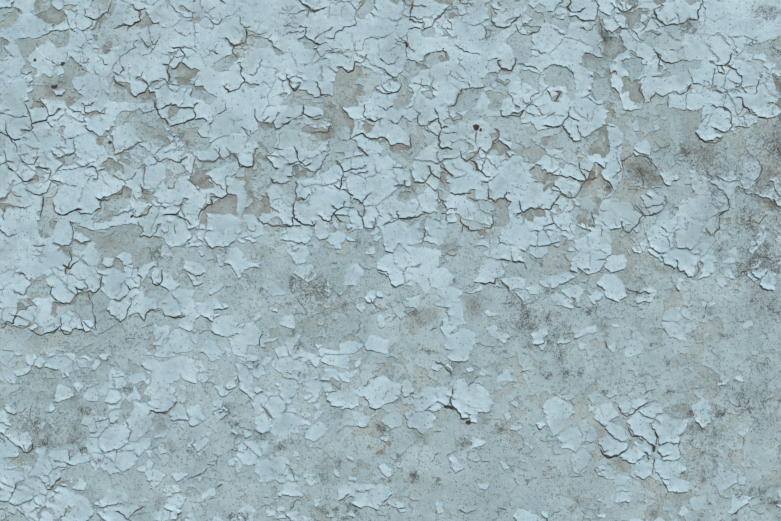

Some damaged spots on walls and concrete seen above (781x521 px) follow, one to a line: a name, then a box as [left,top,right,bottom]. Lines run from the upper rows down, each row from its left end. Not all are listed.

crack [0,0,781,336]
peeling [0,271,414,521]
peeling [405,378,493,434]
peeling [470,436,486,451]
peeling [513,508,550,521]
peeling [536,390,712,521]
crack [598,389,657,473]
peeling [713,461,752,514]